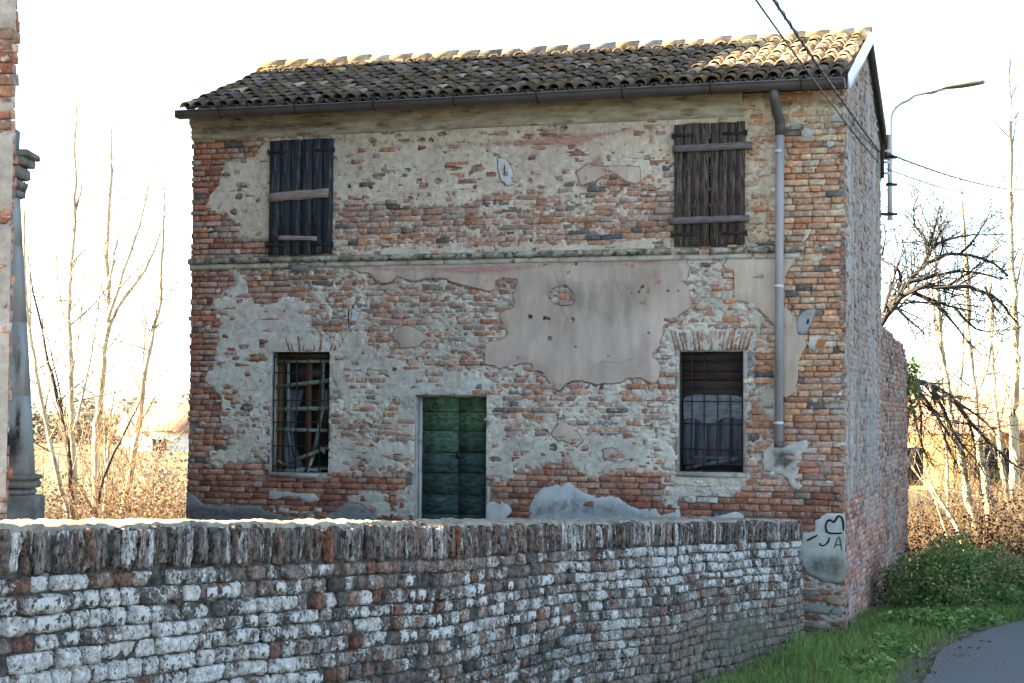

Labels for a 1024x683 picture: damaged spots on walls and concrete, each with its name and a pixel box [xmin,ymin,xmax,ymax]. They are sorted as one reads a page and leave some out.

peeling [186,90,847,533]